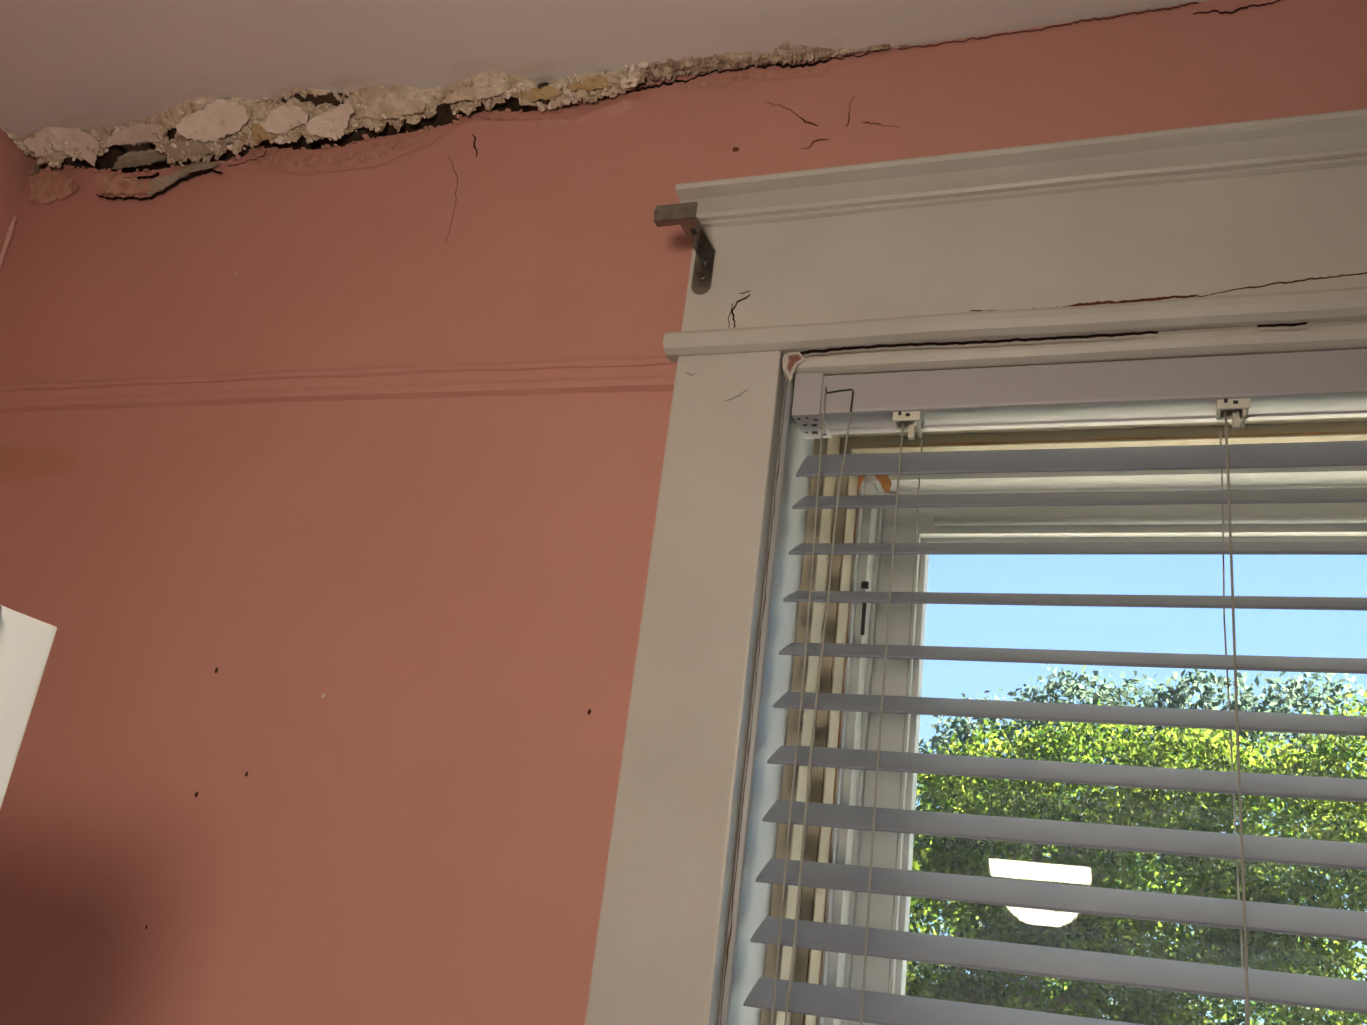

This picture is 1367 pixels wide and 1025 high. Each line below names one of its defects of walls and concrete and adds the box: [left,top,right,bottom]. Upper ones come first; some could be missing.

crack [897,0,1281,50]
flaking render [3,41,907,205]
crack [768,96,900,149]
crack [95,150,267,201]